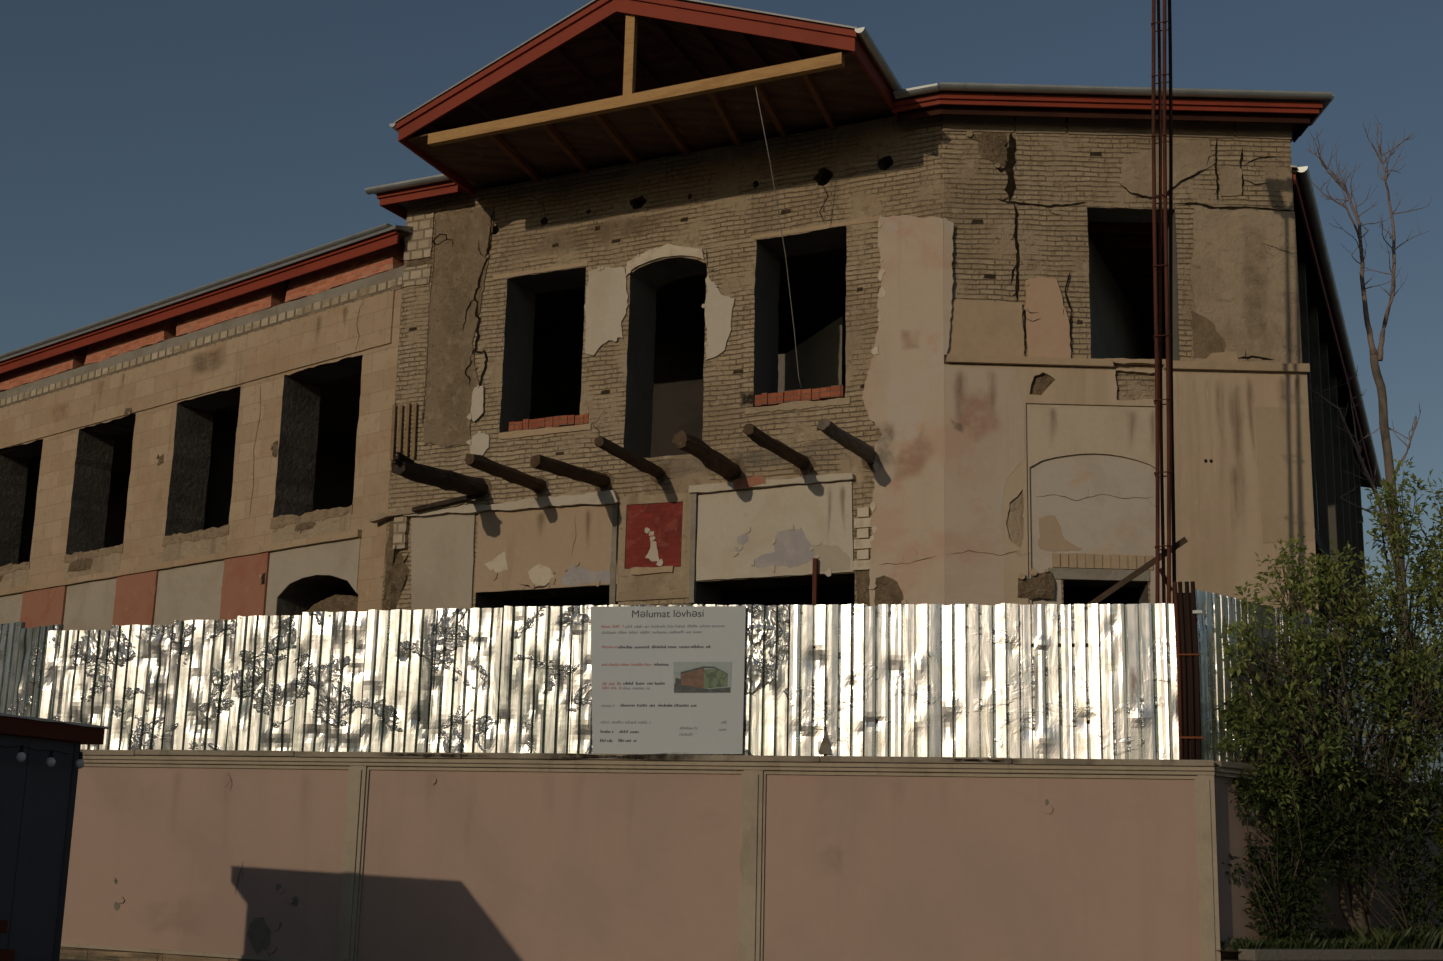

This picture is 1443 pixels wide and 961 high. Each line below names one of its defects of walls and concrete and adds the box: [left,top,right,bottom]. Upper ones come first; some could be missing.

crack [1121,138,1294,211]
crack [997,133,1086,356]
crack [422,215,443,424]
crack [463,212,494,415]
spalling [1030,374,1054,395]
spalling [1006,491,1028,548]
peeling [485,551,507,580]
peeling [528,559,610,589]
peeling [730,524,907,606]